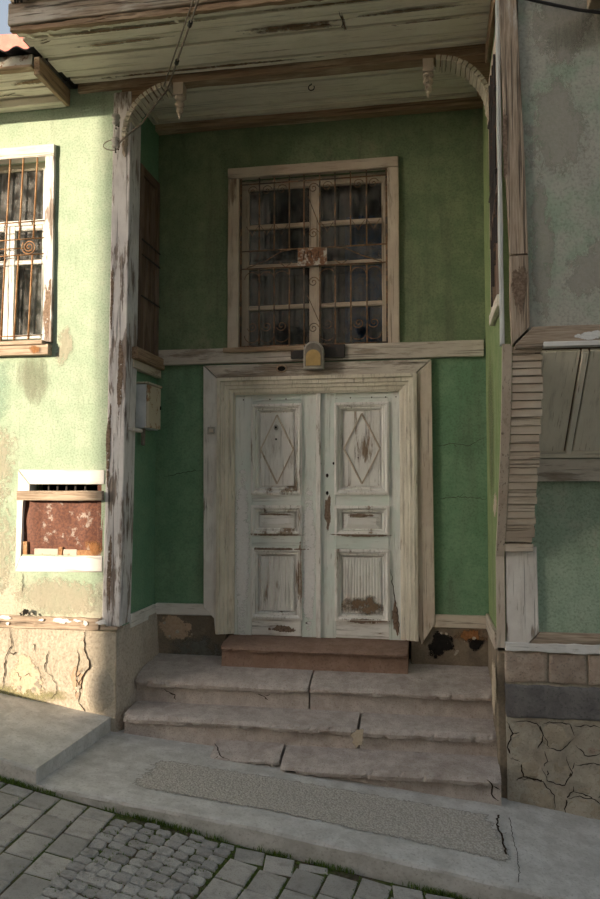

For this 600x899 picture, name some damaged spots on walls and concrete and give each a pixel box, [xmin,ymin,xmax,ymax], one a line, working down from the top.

peeling [511,266,528,314]
peeling [106,267,124,488]
rust [24,485,103,556]
peeling [157,615,192,640]
peeling [341,596,399,636]
spalling [428,631,484,659]
crack [2,628,90,711]